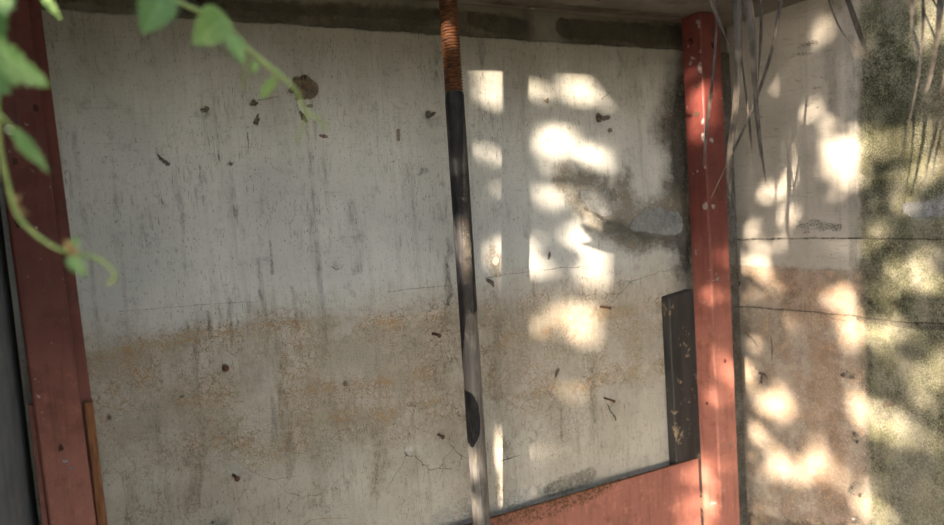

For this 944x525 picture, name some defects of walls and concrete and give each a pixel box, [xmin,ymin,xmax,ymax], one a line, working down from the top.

damp [175,0,440,33]
damp [552,6,693,284]
damp [902,193,944,219]
corrosion [96,303,461,465]
corrosion [480,290,663,410]